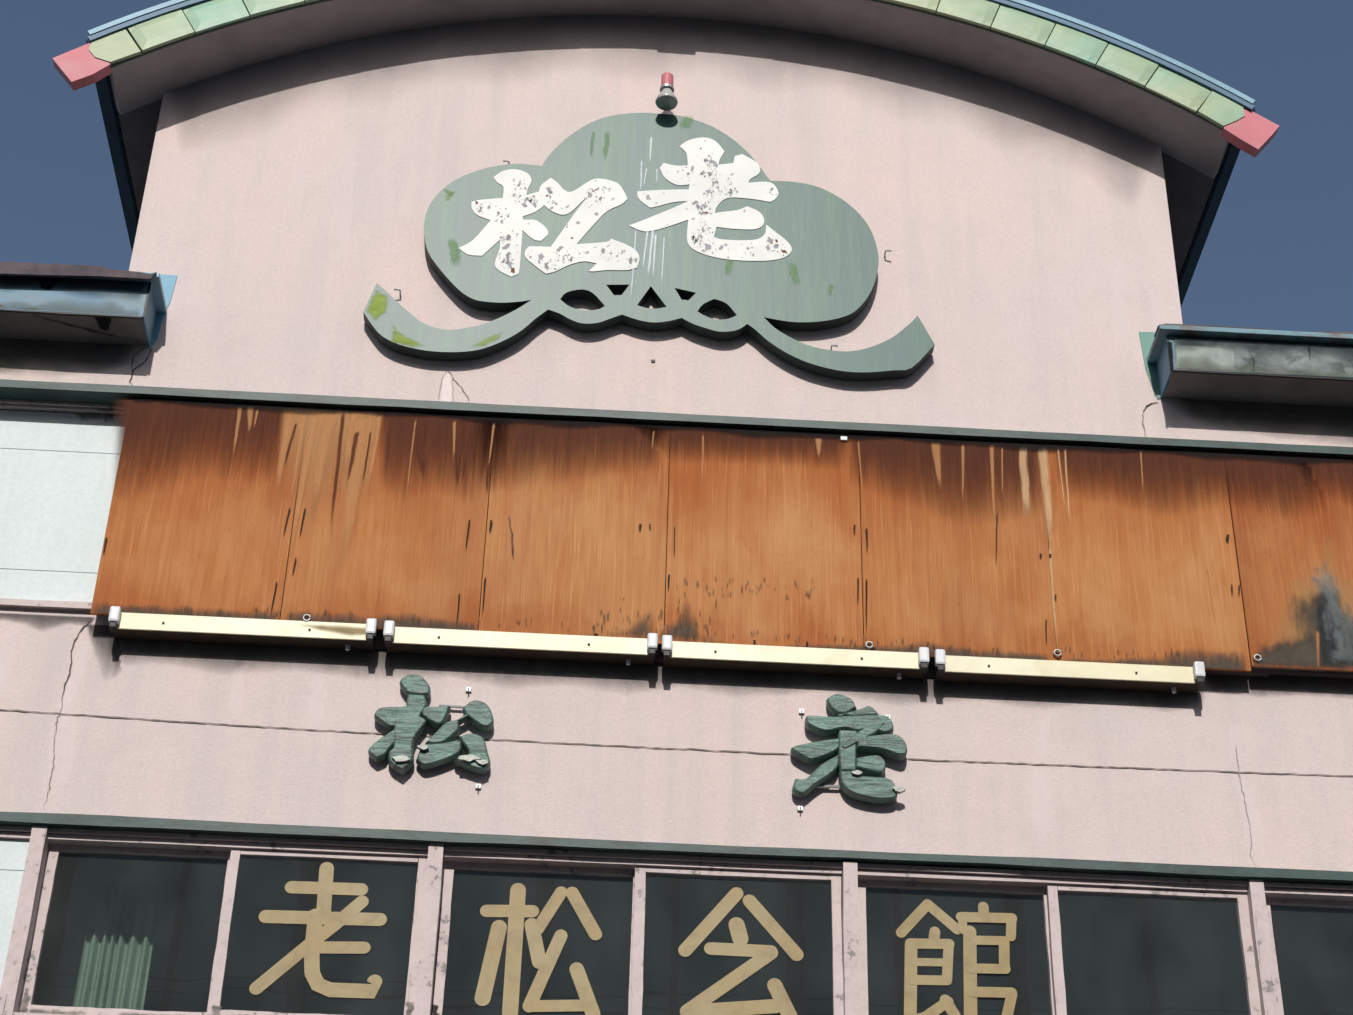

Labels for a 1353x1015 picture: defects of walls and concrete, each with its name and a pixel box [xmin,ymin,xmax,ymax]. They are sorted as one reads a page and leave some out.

water stain [1073,591,1353,669]
crack [0,619,388,810]
crack [420,735,789,754]
crack [882,748,1353,867]